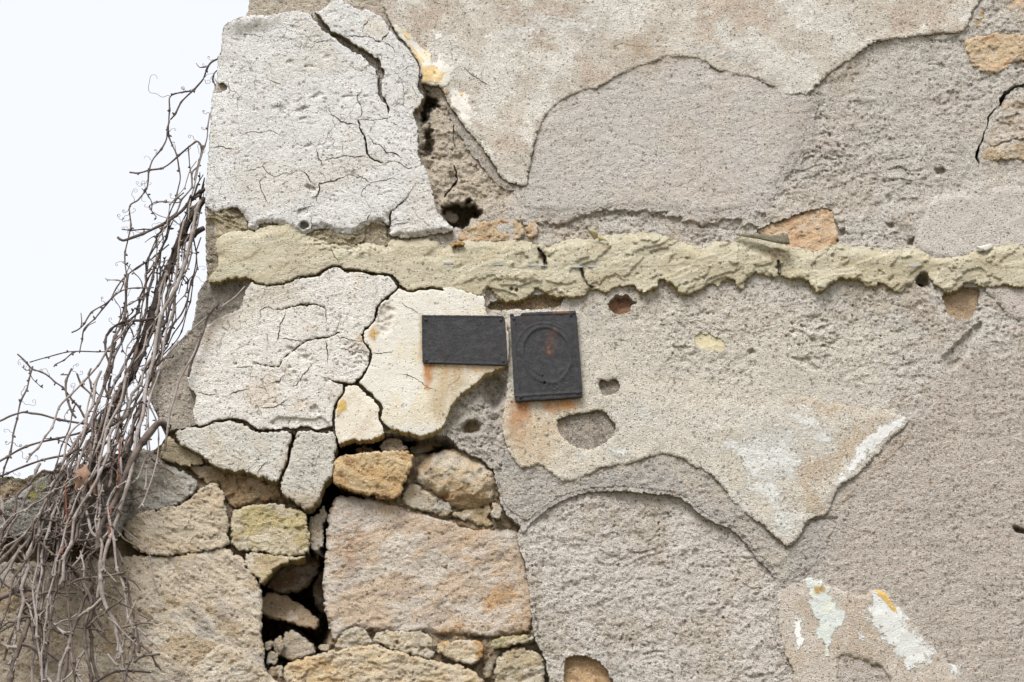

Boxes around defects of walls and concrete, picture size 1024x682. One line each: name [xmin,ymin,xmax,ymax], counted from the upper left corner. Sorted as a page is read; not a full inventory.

crack [245,12,429,237]
peeling [498,6,615,55]
peeling [387,21,819,217]
peeling [735,232,790,244]
crack [198,251,460,481]
spalling [499,404,911,682]